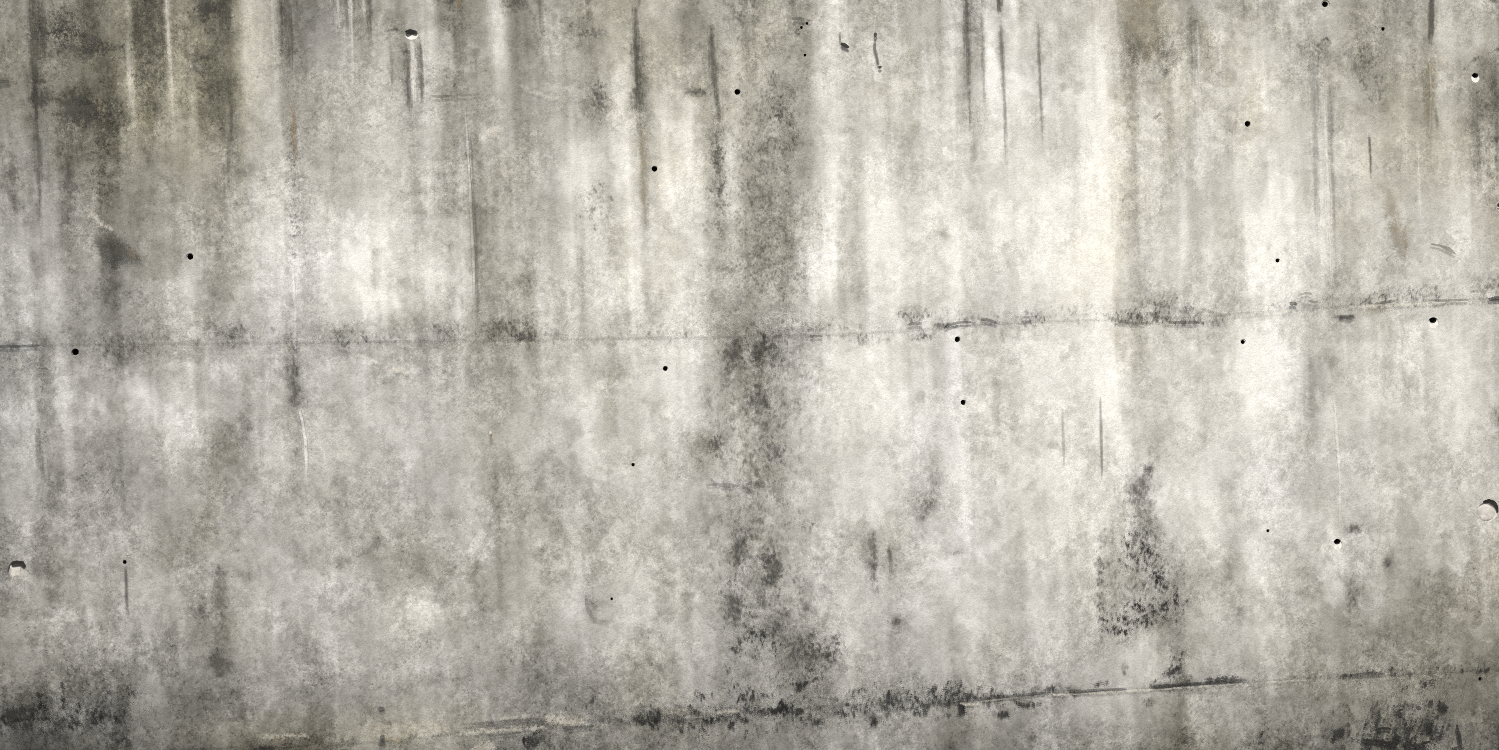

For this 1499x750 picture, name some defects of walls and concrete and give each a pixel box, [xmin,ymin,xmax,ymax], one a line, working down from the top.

damp [29,0,164,149]
damp [723,338,780,484]
mould [1098,466,1189,635]